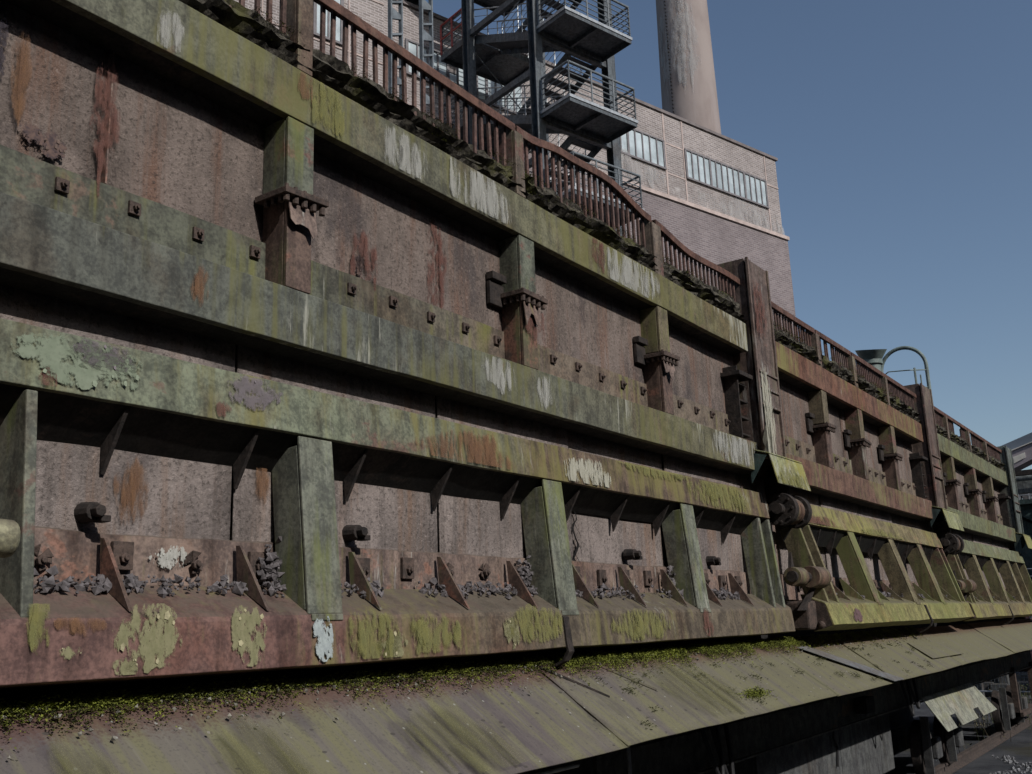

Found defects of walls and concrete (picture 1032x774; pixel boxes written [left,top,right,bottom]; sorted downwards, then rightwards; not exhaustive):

peeling [11,332,143,390]
peeling [564,458,611,487]
peeling [148,545,190,570]
peeling [313,616,333,662]